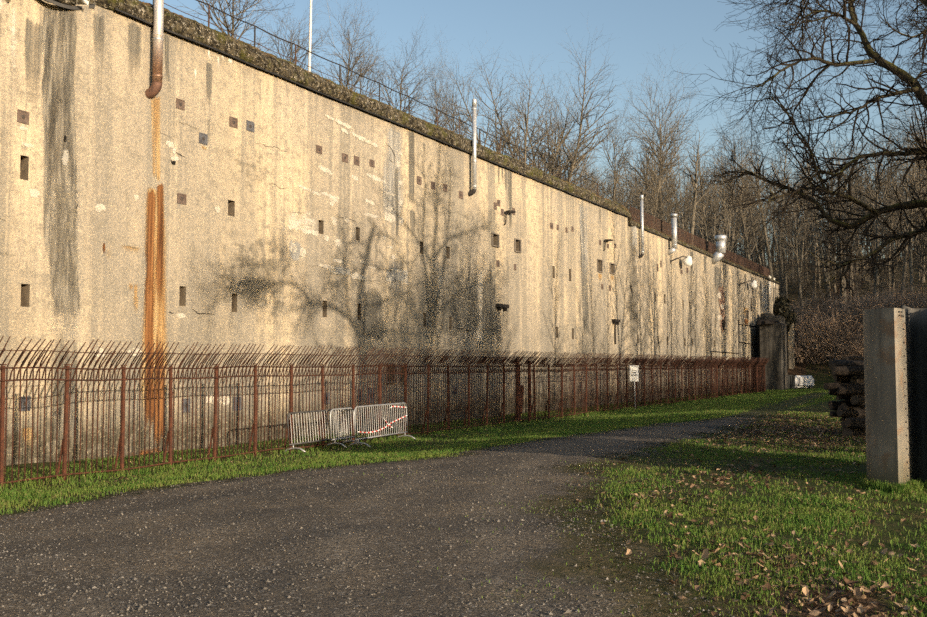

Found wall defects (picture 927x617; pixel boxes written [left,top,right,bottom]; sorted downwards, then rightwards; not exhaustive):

peeling [325,114,378,147]
damp [0,1,79,312]
peeling [351,173,404,224]
peeling [288,213,341,261]
rust [122,97,166,455]
peeling [318,259,376,281]
damp [55,345,77,435]